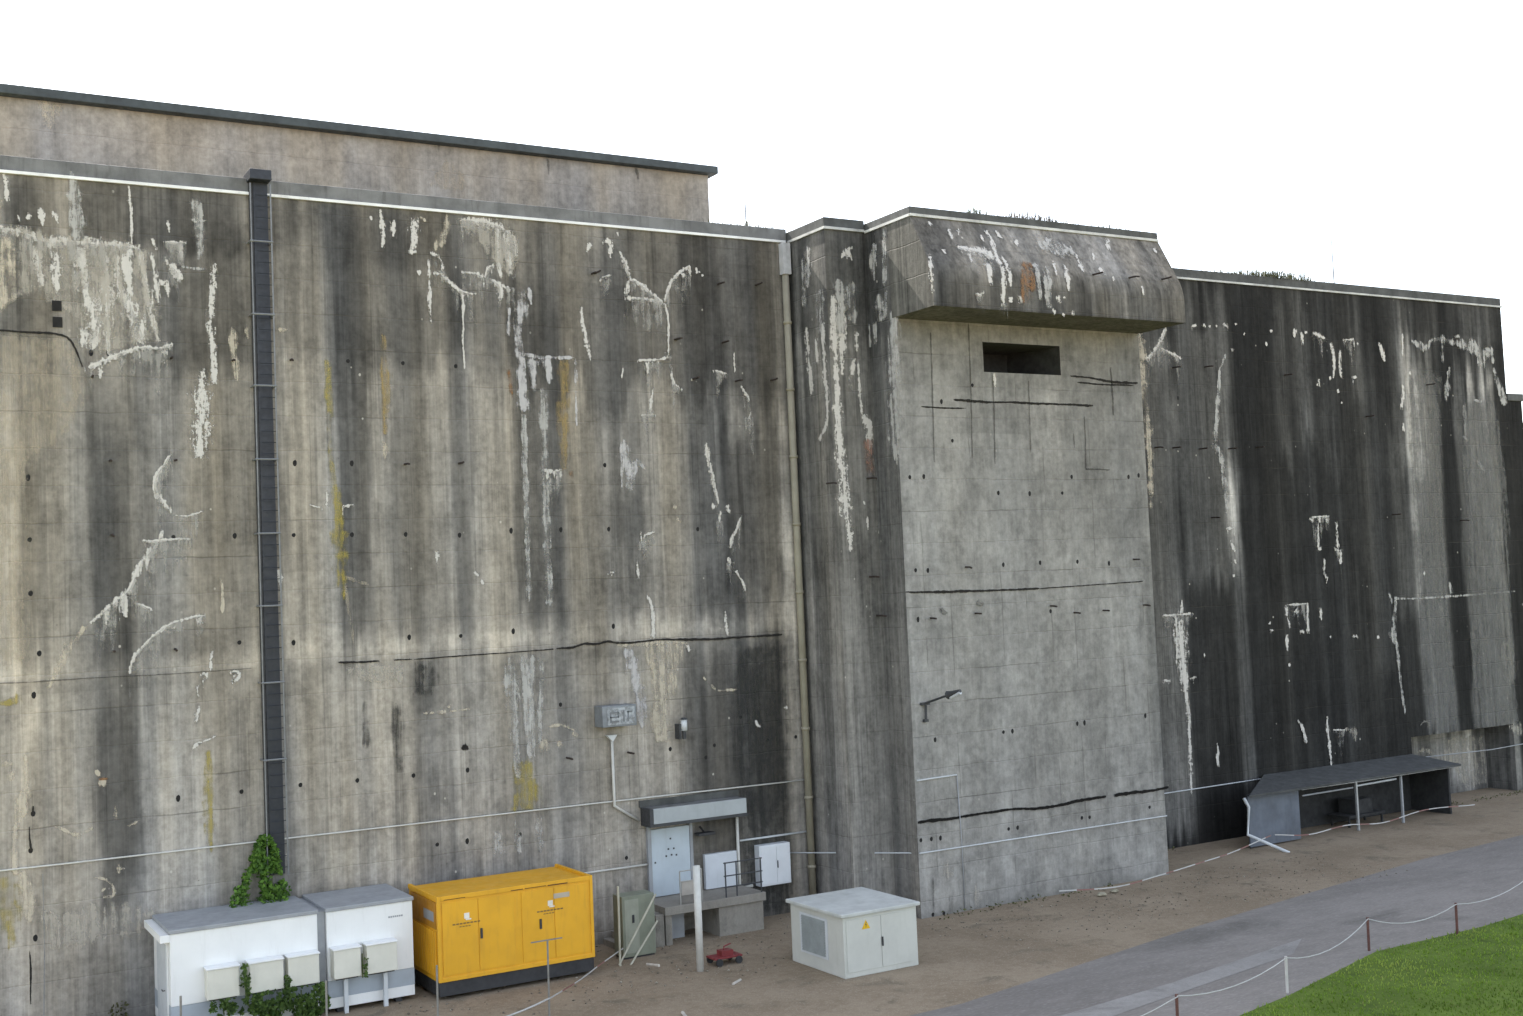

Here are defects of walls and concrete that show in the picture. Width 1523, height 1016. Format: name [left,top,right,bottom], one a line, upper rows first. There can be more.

leakage [370,209,518,278]
efflorescence [0,171,248,459]
leakage [507,288,591,604]
efflorescence [801,232,902,552]
efflorescence [1214,349,1232,509]
efflorescence [1317,338,1359,404]
efflorescence [1378,333,1411,433]
crack [610,442,746,591]
leakage [1309,515,1342,584]
crack [339,633,782,664]
leakage [1377,594,1406,712]
leakage [1326,716,1357,765]